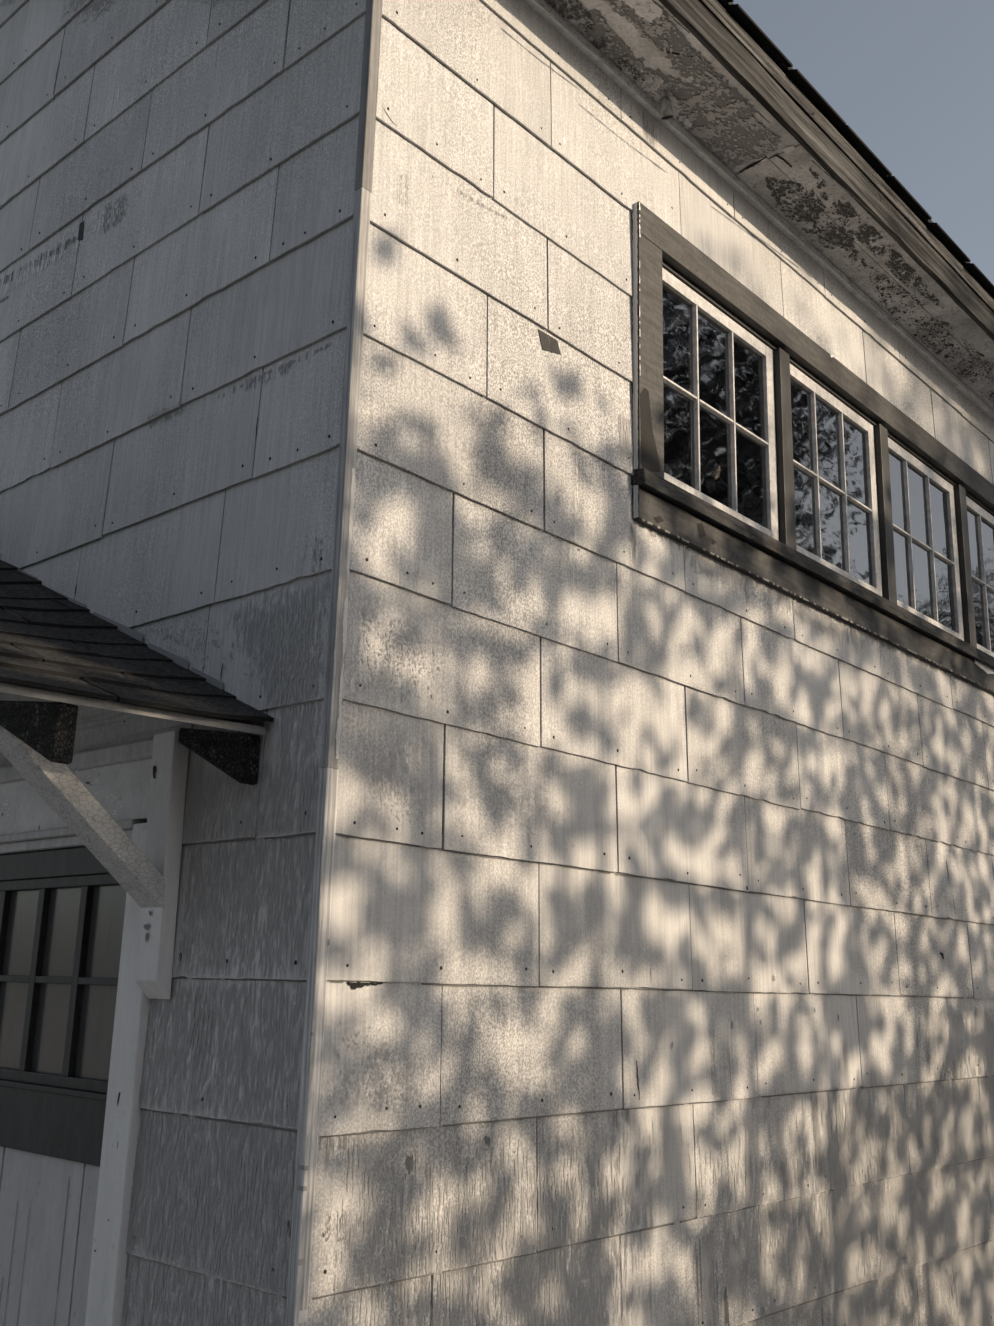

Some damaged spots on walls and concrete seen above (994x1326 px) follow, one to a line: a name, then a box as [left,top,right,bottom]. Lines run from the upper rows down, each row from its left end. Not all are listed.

peeling [632,203,661,472]
peeling [541,0,994,405]
leakage [829,999,994,1326]